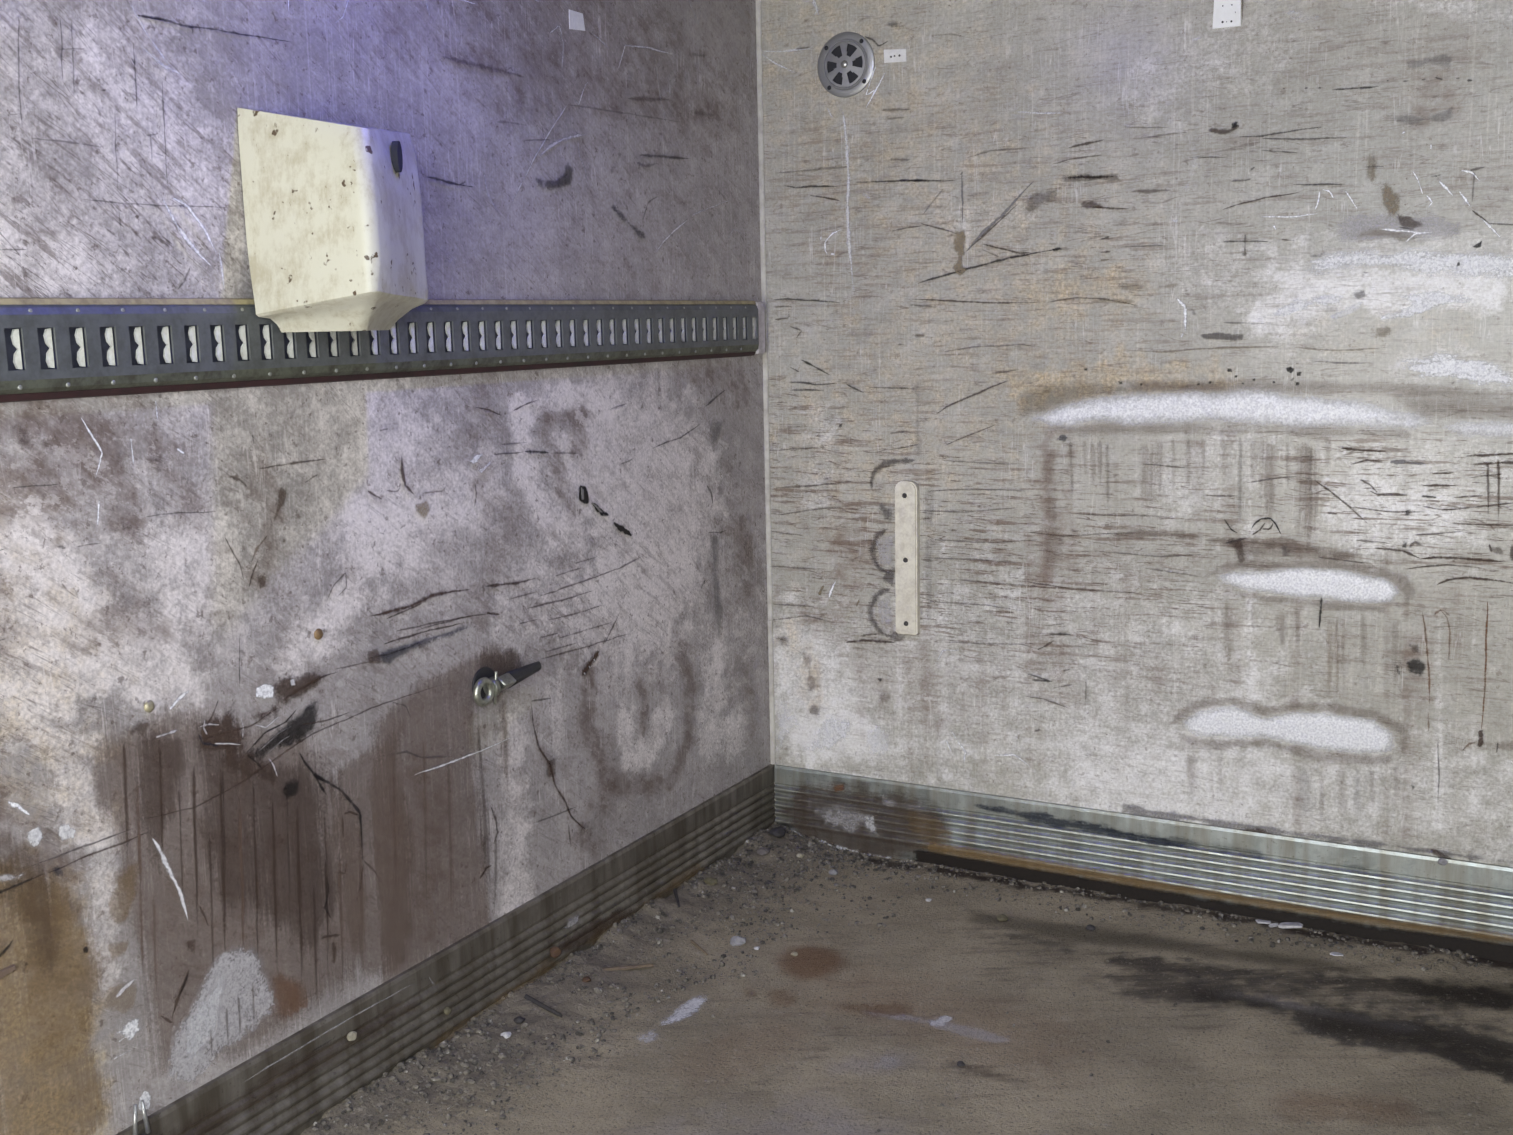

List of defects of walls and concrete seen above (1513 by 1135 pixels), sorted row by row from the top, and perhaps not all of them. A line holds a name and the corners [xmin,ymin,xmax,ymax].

water stain [123,748,143,953]
water stain [170,783,277,1082]